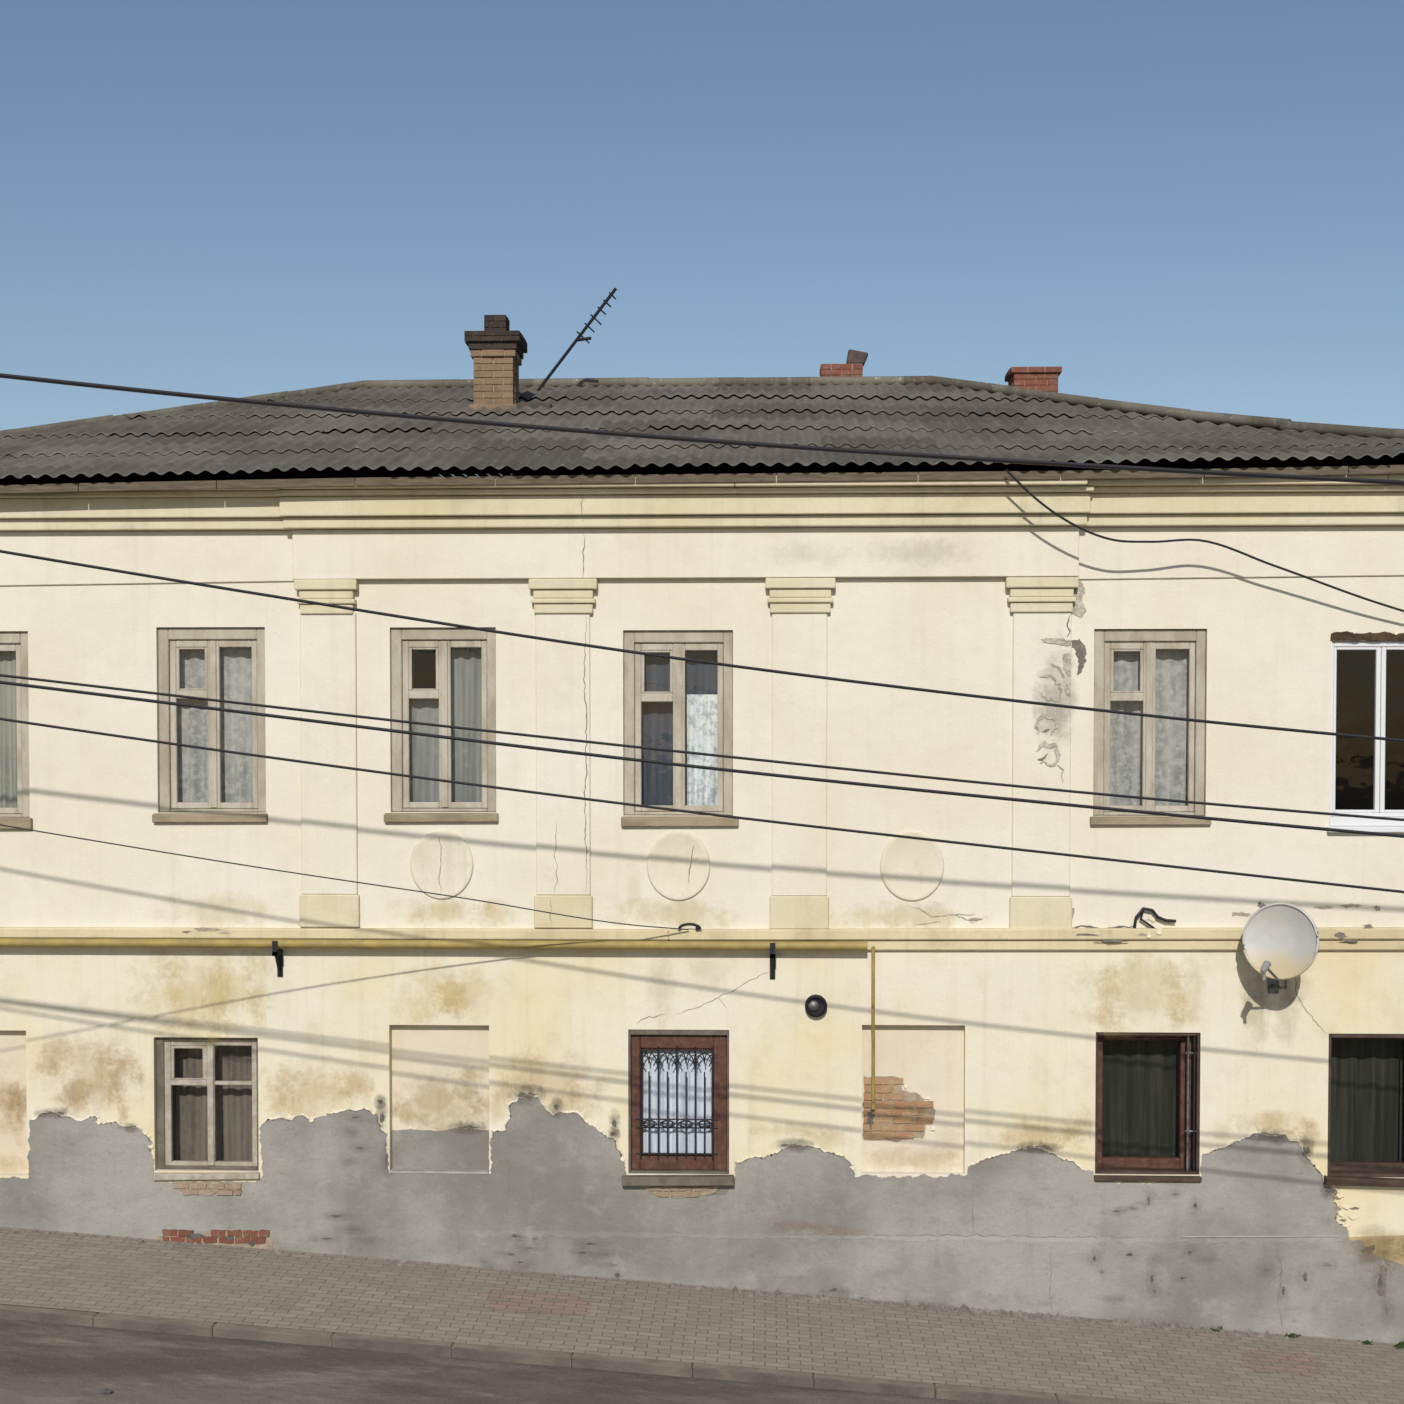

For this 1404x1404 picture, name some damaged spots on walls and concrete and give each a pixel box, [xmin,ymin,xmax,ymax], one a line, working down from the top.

spalling [1034,581,1087,781]
crack [638,972,769,1023]
flaking render [863,1076,936,1142]
spalling [0,1091,1404,1344]